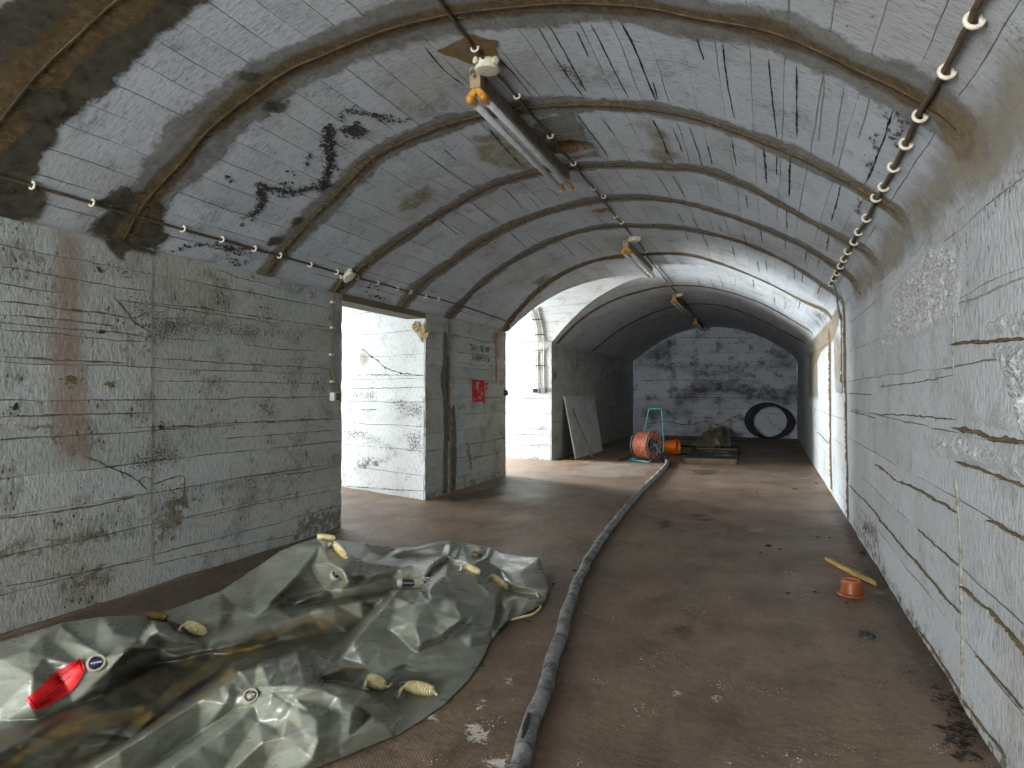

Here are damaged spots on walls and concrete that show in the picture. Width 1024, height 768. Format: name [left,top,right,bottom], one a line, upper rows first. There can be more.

leakage [0,0,210,222]
crack [424,47,463,85]
crack [489,129,523,167]
crack [428,149,593,256]
leakage [88,0,1024,308]
crack [539,23,893,309]
crack [1,260,424,587]
leakage [427,223,885,574]